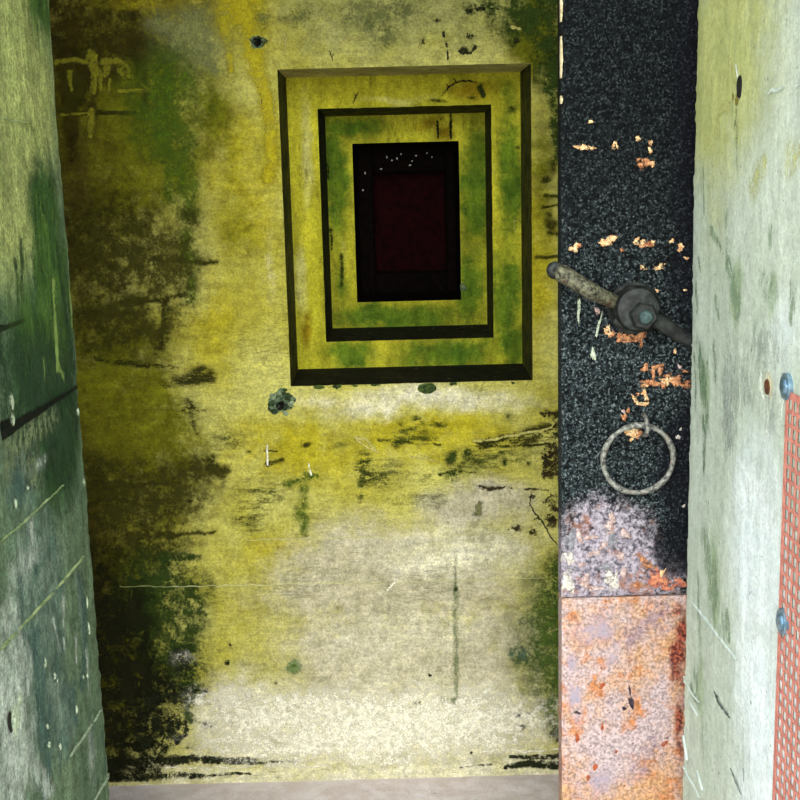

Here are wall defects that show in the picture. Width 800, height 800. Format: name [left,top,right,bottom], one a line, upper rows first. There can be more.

damp [49,0,234,162]
crack [441,78,477,96]
peeling [636,136,655,170]
peeling [598,235,624,251]
peeling [633,237,655,248]
damp [65,191,219,388]
damp [377,416,446,448]
damp [422,410,558,536]
crack [529,493,558,545]
peeling [561,511,632,594]
damp [17,515,55,800]
damp [69,452,559,782]